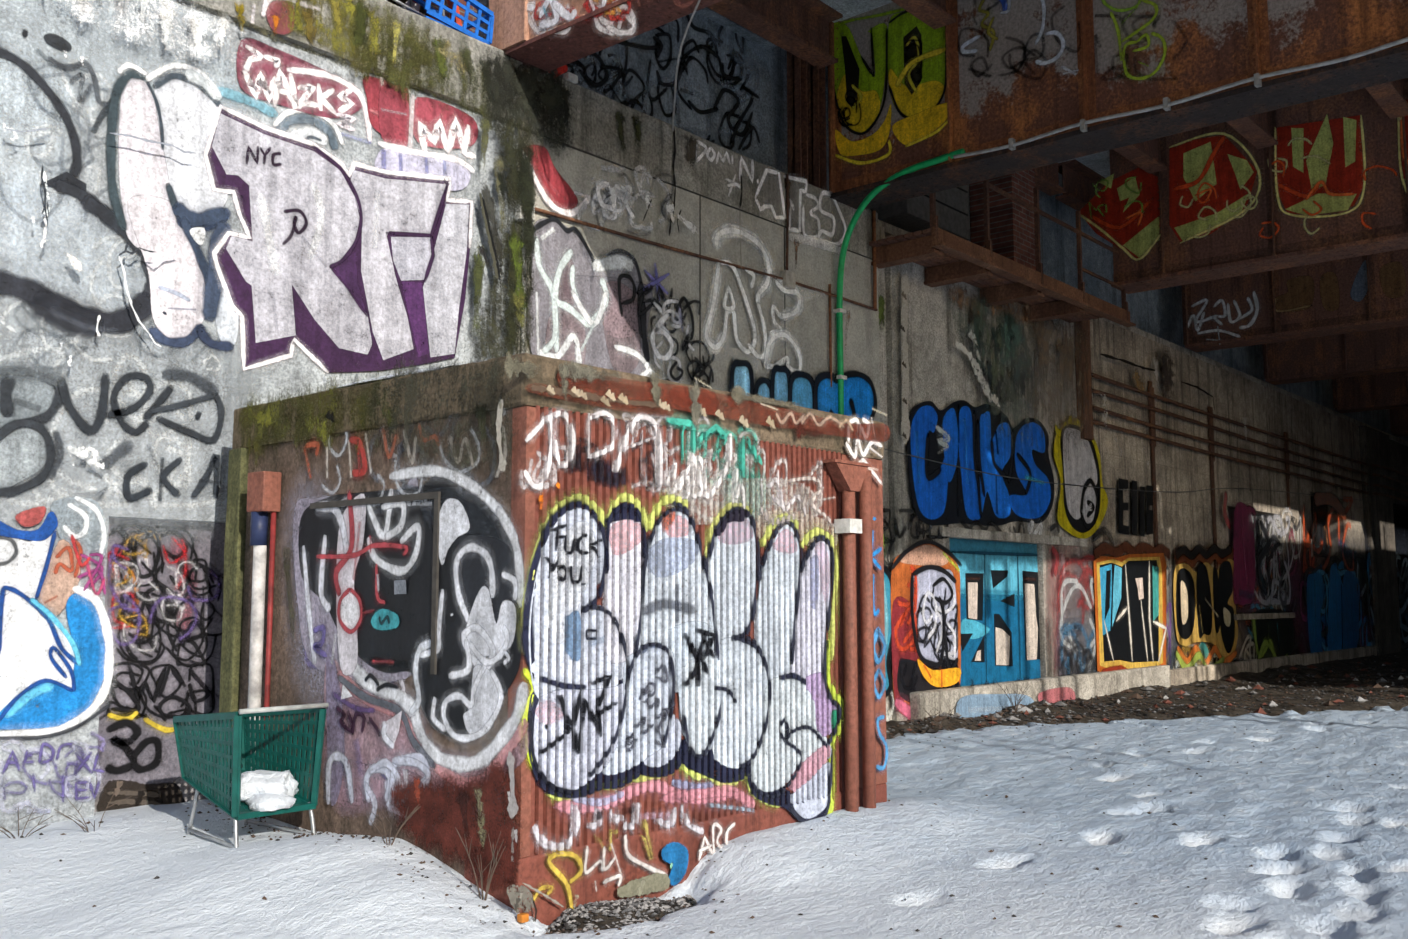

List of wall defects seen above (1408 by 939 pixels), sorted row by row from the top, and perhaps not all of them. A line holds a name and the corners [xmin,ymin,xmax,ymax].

leakage [296,0,400,61]
leakage [432,37,575,332]